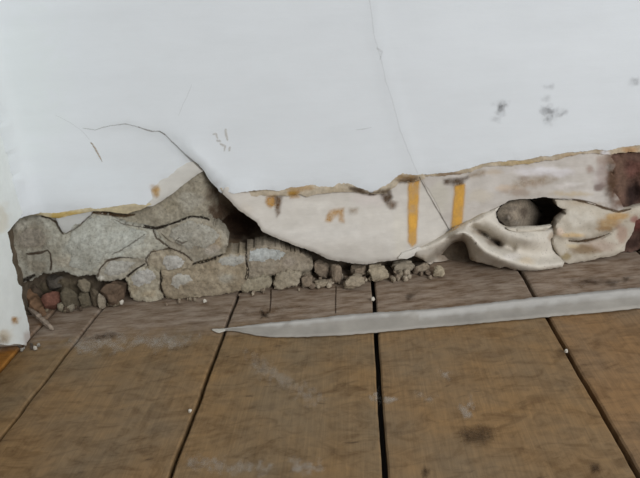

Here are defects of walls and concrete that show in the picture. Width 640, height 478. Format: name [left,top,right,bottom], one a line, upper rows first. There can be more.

flaking render [12,161,314,302]
corrosion [267,197,281,209]
flaking render [249,145,640,264]